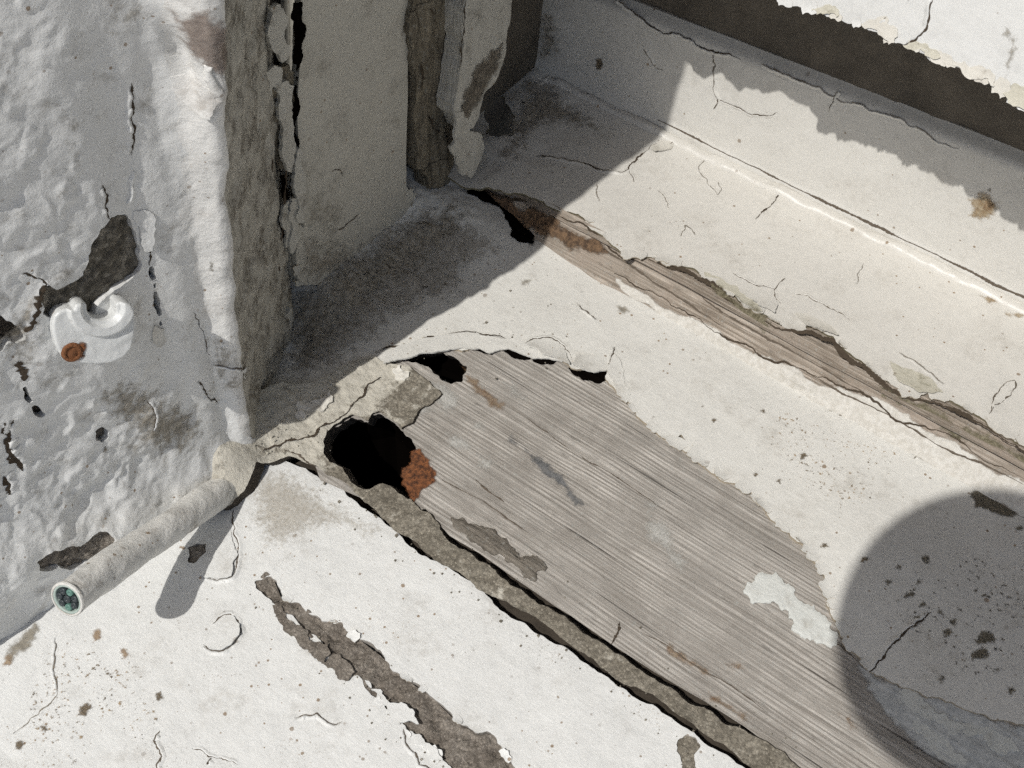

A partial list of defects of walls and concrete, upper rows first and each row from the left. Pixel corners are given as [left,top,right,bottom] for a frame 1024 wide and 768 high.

crack [615,0,959,150]
peeling [777,0,1024,111]
crack [124,83,136,156]
rust [970,190,996,218]
spalling [39,210,156,314]
peeling [699,268,849,349]
rust [401,449,436,502]
spalling [38,531,115,569]
peeling [316,332,1024,768]
crack [203,610,246,656]
spalling [255,572,513,768]
crack [837,610,931,672]